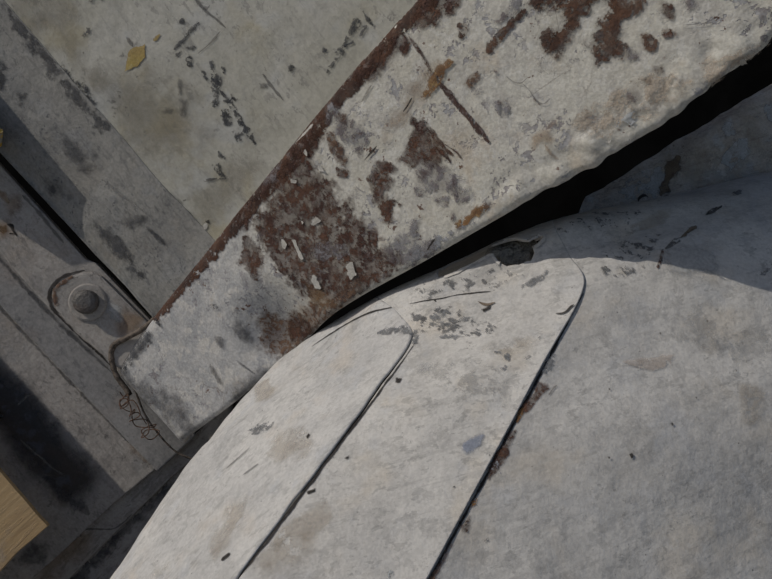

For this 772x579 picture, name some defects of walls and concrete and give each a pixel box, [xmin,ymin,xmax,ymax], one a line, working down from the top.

rust [486,0,597,59]
rust [585,0,646,66]
rust [641,29,676,52]
rust [662,3,674,19]
rust [233,109,401,359]
peeling [411,306,496,343]
rust [488,382,549,479]